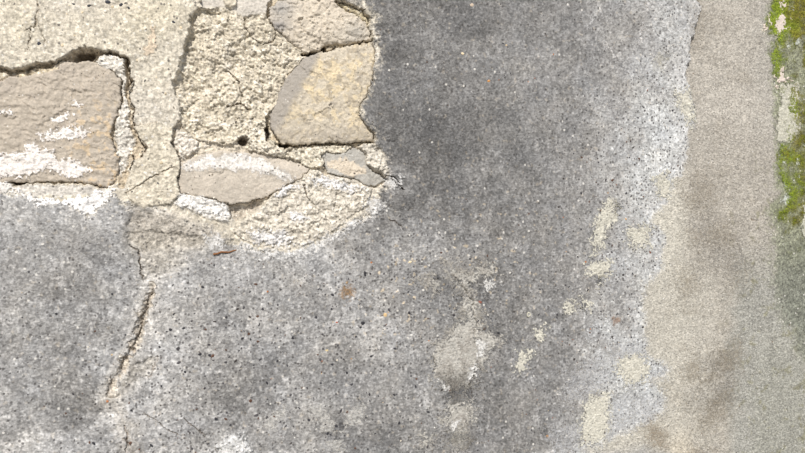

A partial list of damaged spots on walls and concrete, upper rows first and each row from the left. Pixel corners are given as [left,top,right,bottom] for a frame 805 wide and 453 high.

crack [244,19,277,45]
spalling [0,48,146,189]
crack [74,57,181,194]
crack [227,71,248,111]
spalling [172,0,387,221]
crack [227,169,315,206]
leakage [384,173,403,190]
leakage [203,175,387,263]
crack [107,245,159,394]
leakage [467,340,488,380]
crack [143,413,206,438]
leakage [311,403,366,453]